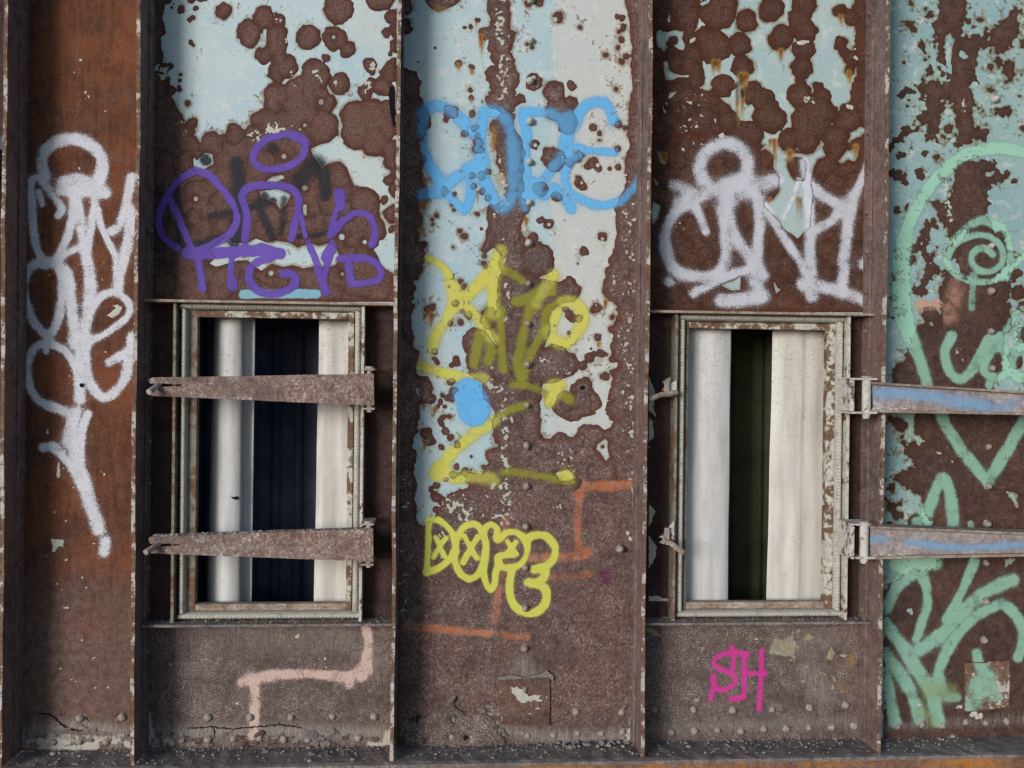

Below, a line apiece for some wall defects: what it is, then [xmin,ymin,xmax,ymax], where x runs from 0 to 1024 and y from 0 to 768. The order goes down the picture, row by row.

peeling [650,0,866,312]
corrosion [768,138,793,159]
peeling [889,0,1024,390]
peeling [153,0,638,746]
peeling [872,407,1024,535]
peeling [883,557,1024,738]
crack [39,713,91,732]
corrosion [28,718,130,749]
crack [188,723,306,739]